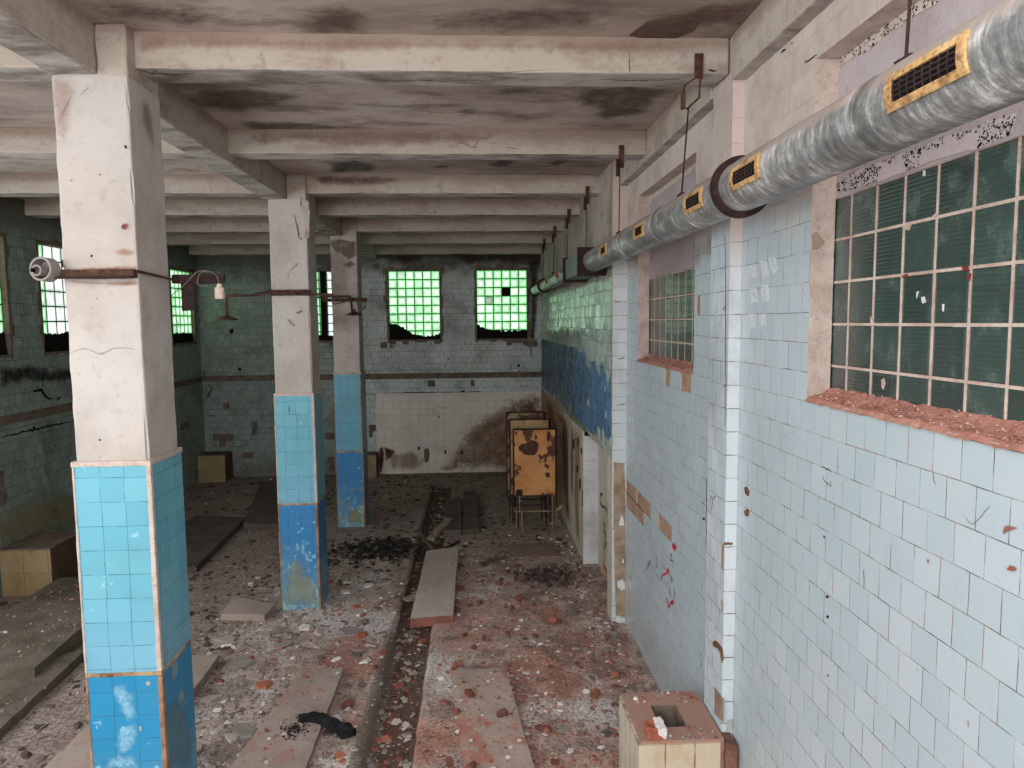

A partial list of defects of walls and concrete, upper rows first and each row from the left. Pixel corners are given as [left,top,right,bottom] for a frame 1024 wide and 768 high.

damp [204,90,289,110]
damp [584,89,663,118]
peeling [331,240,355,267]
crack [1,369,72,438]
peeling [573,411,612,507]
peeling [626,480,672,542]